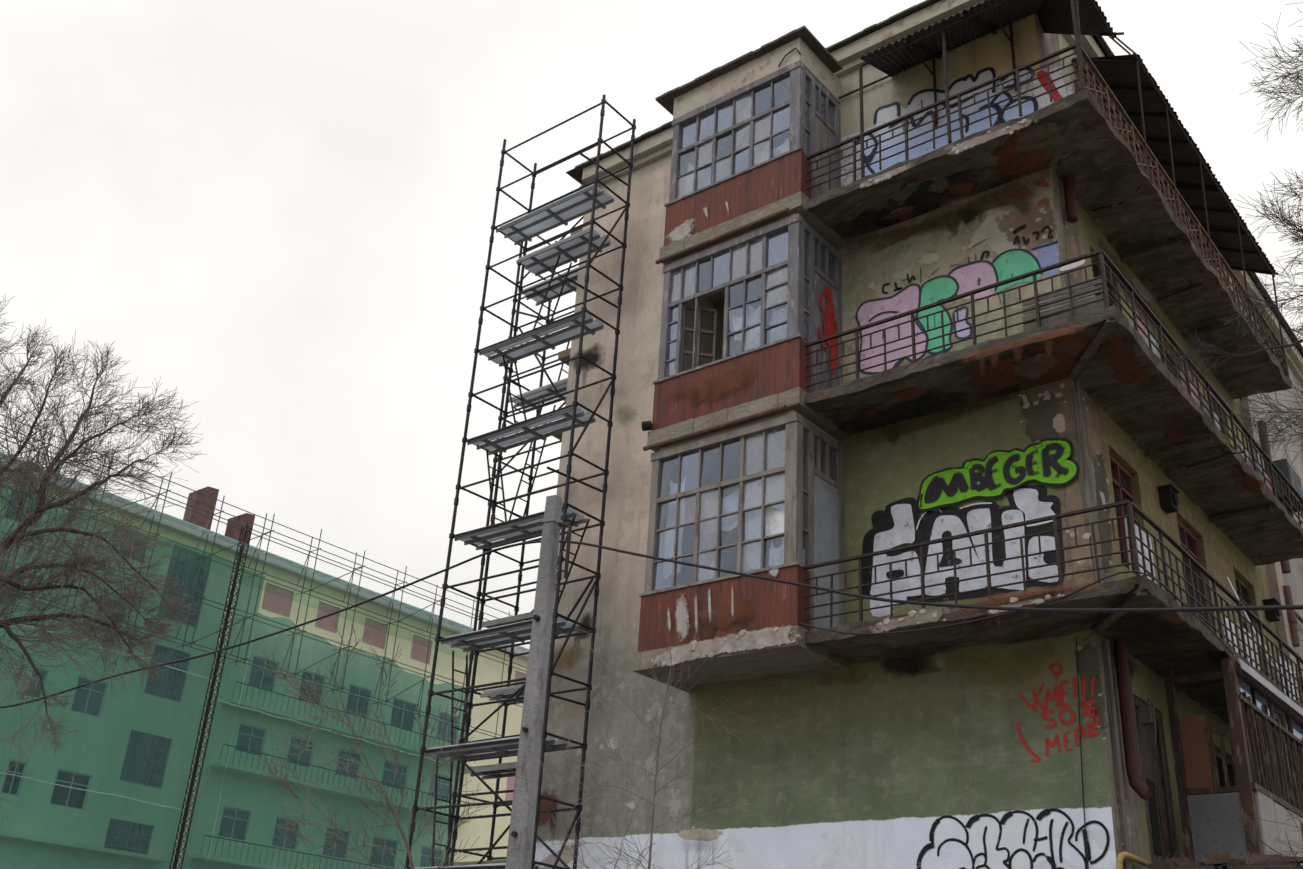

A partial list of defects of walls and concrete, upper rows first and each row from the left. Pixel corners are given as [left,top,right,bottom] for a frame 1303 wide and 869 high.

peeling [669,207,708,241]
flaking render [961,179,1060,262]
spalling [647,590,802,667]